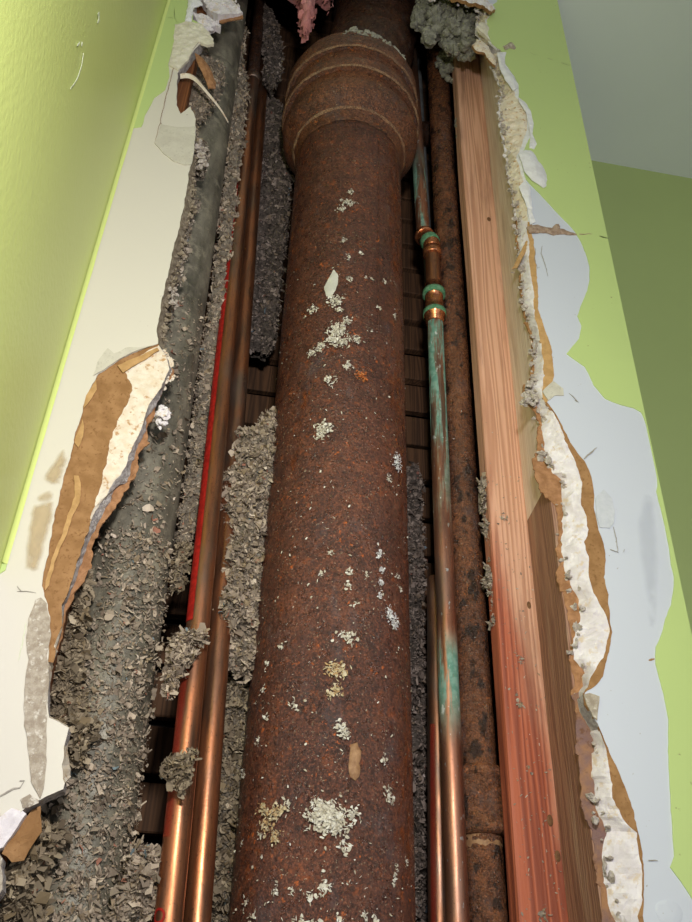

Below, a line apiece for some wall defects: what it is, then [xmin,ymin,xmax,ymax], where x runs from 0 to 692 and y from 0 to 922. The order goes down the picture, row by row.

peeling [0,0,255,848]
spalling [245,172,295,427]
spalling [267,0,335,108]
spalling [401,166,435,672]
spalling [421,34,429,121]
spalling [426,147,435,233]
peeling [450,0,692,922]